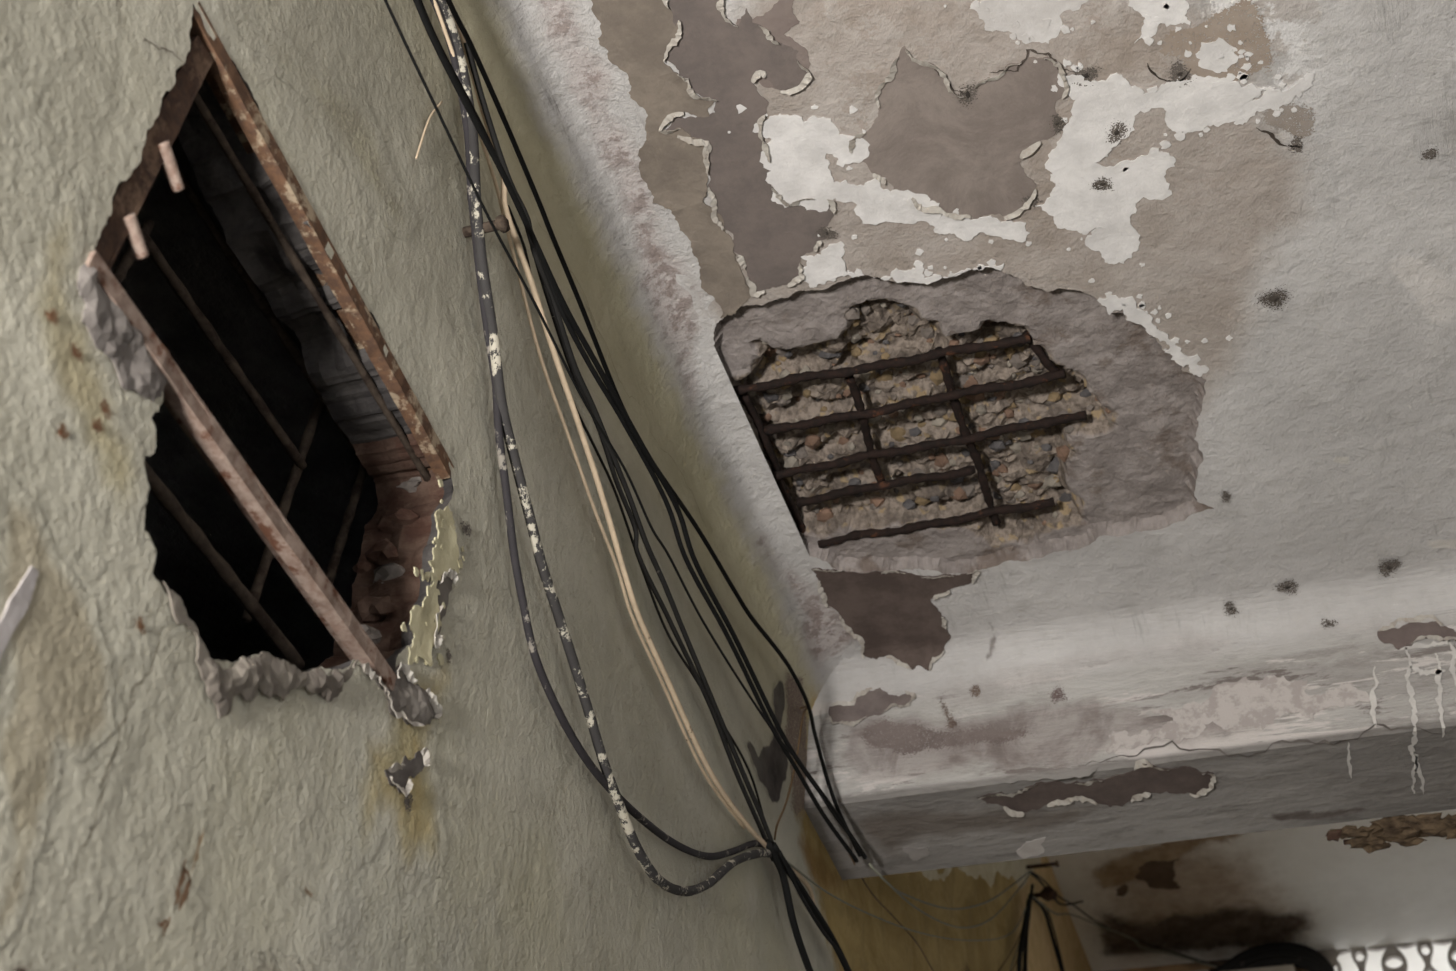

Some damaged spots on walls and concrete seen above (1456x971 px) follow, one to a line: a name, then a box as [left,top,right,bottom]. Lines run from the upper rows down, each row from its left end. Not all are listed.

spalling [591,0,1315,671]
peeling [828,687,1034,758]